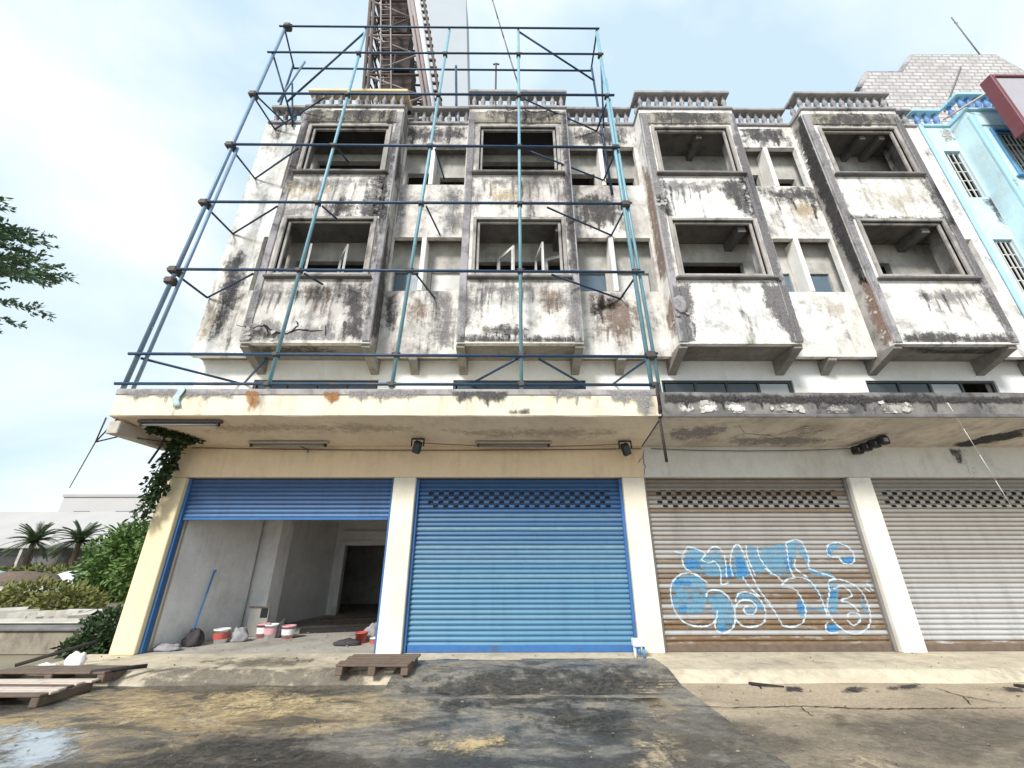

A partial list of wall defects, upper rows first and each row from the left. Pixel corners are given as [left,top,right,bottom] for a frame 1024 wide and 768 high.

water stain [202,108,639,353]
water stain [641,112,1014,354]
crack [237,321,326,338]
rust [246,391,259,411]
water stain [453,391,507,406]
peeling [679,400,745,413]
peeling [770,403,805,413]
water stain [610,390,1024,414]
peeling [878,400,912,413]
water stain [950,429,1024,463]